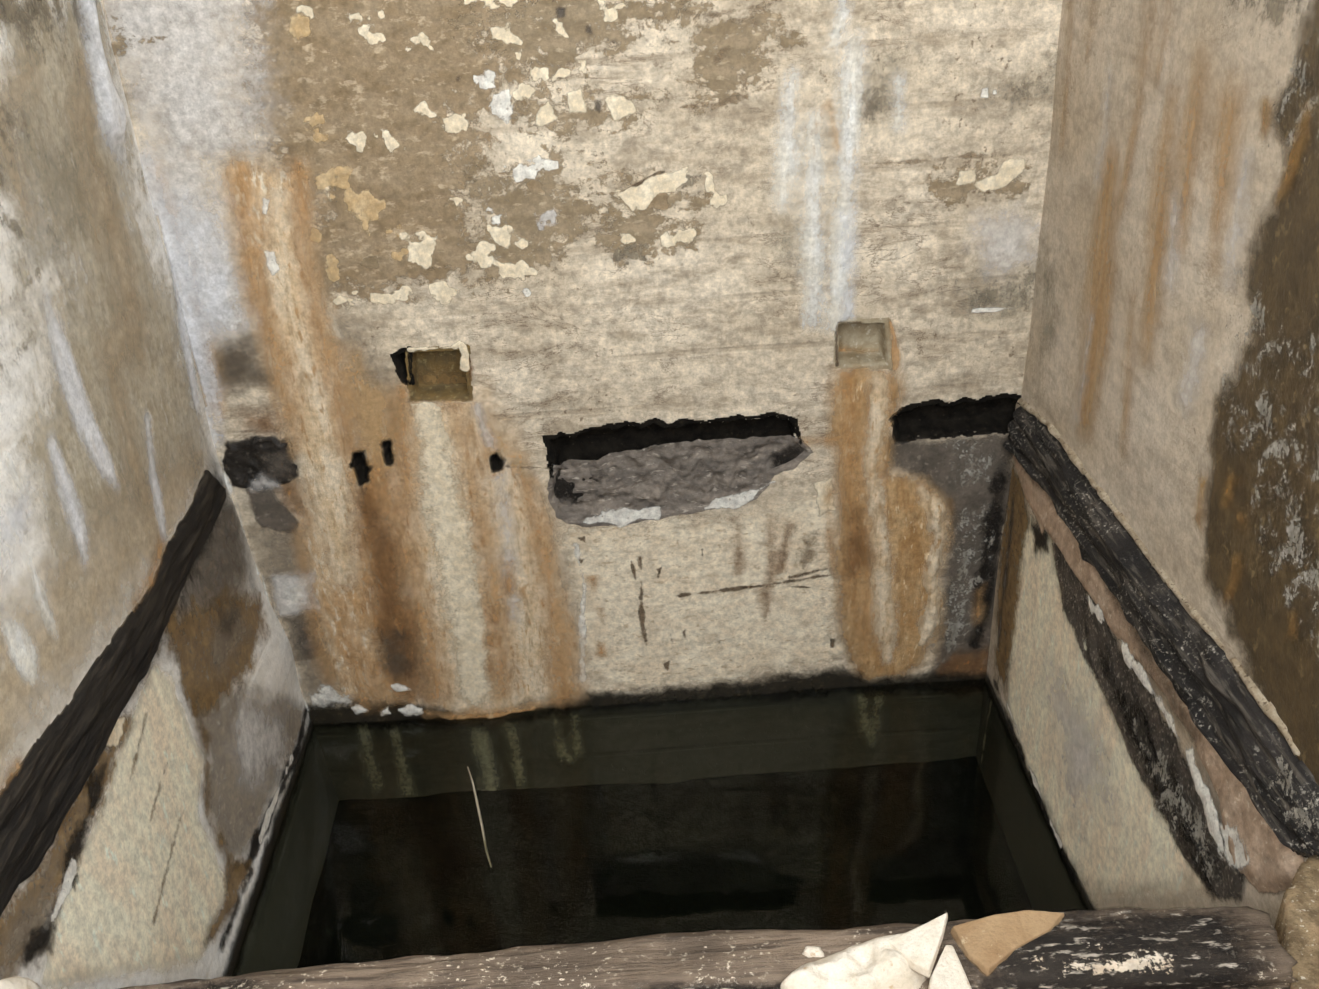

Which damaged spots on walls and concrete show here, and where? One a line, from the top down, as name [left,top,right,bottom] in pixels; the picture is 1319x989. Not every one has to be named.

corrosion [226,161,420,704]
peeling [450,0,807,297]
flaking render [542,412,846,695]
spalling [889,393,1021,443]
peeling [885,152,1030,207]
corrosion [1080,161,1114,427]
corrosion [1146,73,1201,341]
water stain [1195,0,1319,849]